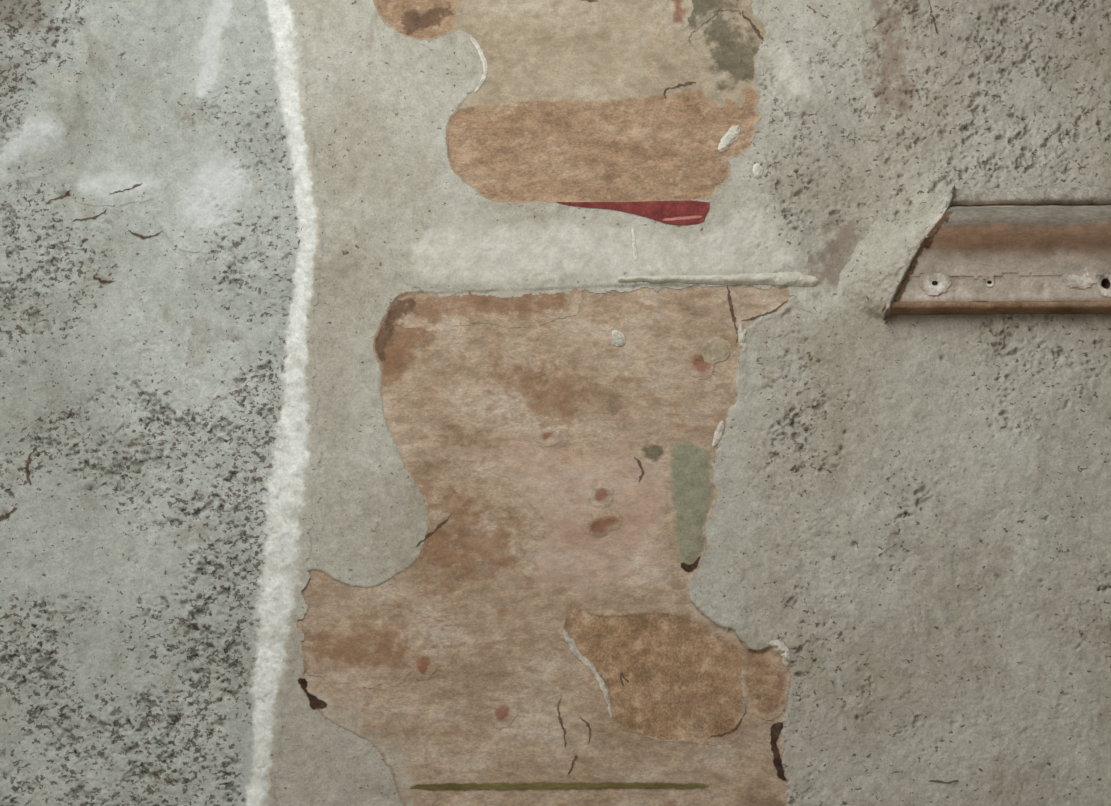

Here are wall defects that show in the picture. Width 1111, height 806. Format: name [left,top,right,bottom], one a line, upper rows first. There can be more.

flaking render [373,0,761,204]
water stain [665,0,827,117]
water stain [821,0,958,141]
crack [727,285,787,345]
flaking render [295,285,798,806]